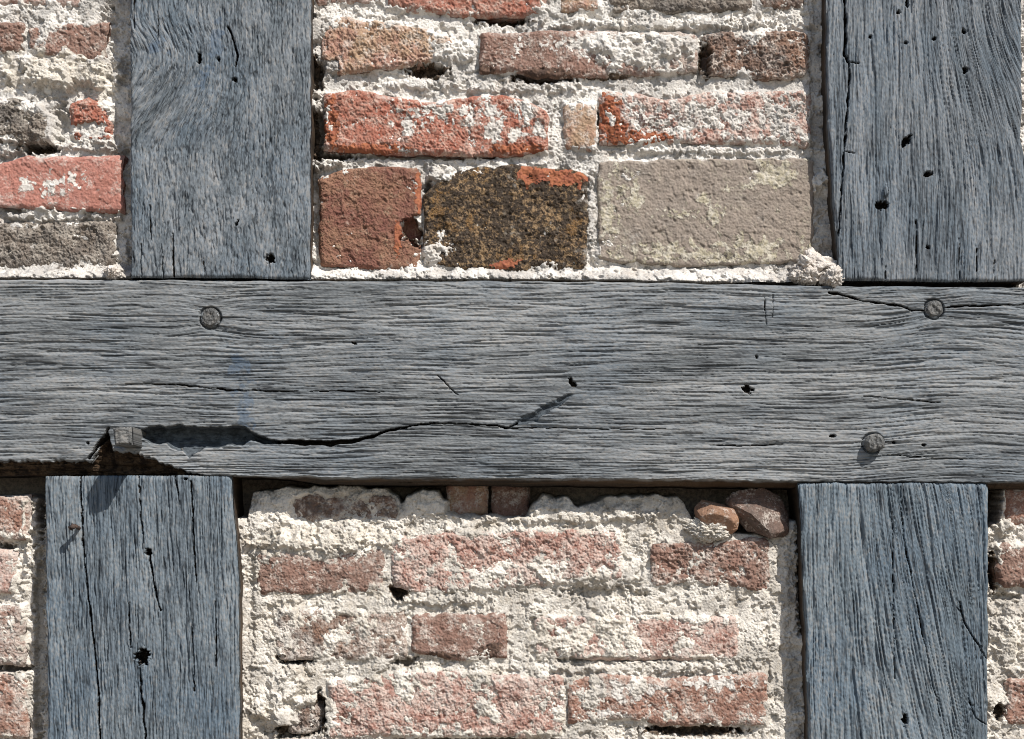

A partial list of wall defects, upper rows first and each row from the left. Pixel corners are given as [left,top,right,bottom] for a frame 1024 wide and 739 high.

crack [837,0,859,237]
crack [912,221,920,274]
crack [828,270,1024,312]
crack [154,384,290,392]
crack [278,422,557,447]
crack [138,485,162,611]
crack [175,476,197,582]
crack [80,428,110,739]
crack [139,677,147,739]